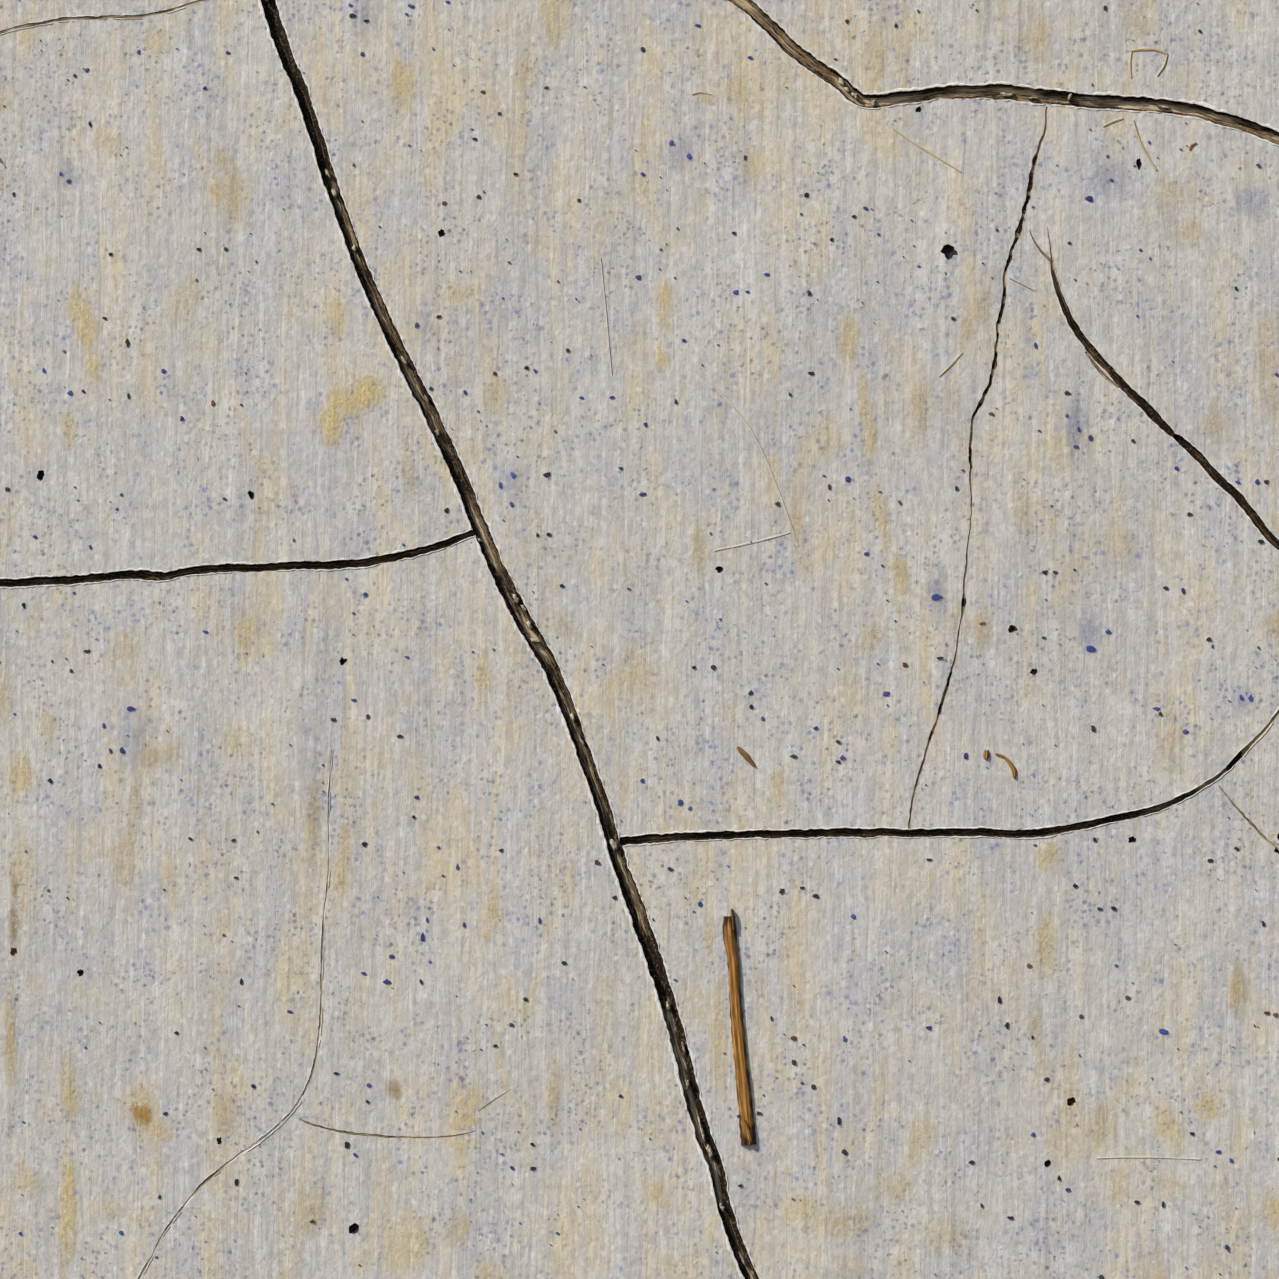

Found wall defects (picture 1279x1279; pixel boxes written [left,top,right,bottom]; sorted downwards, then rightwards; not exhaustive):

crack [724,0,1279,147]
crack [0,0,762,1279]
crack [619,107,1279,850]